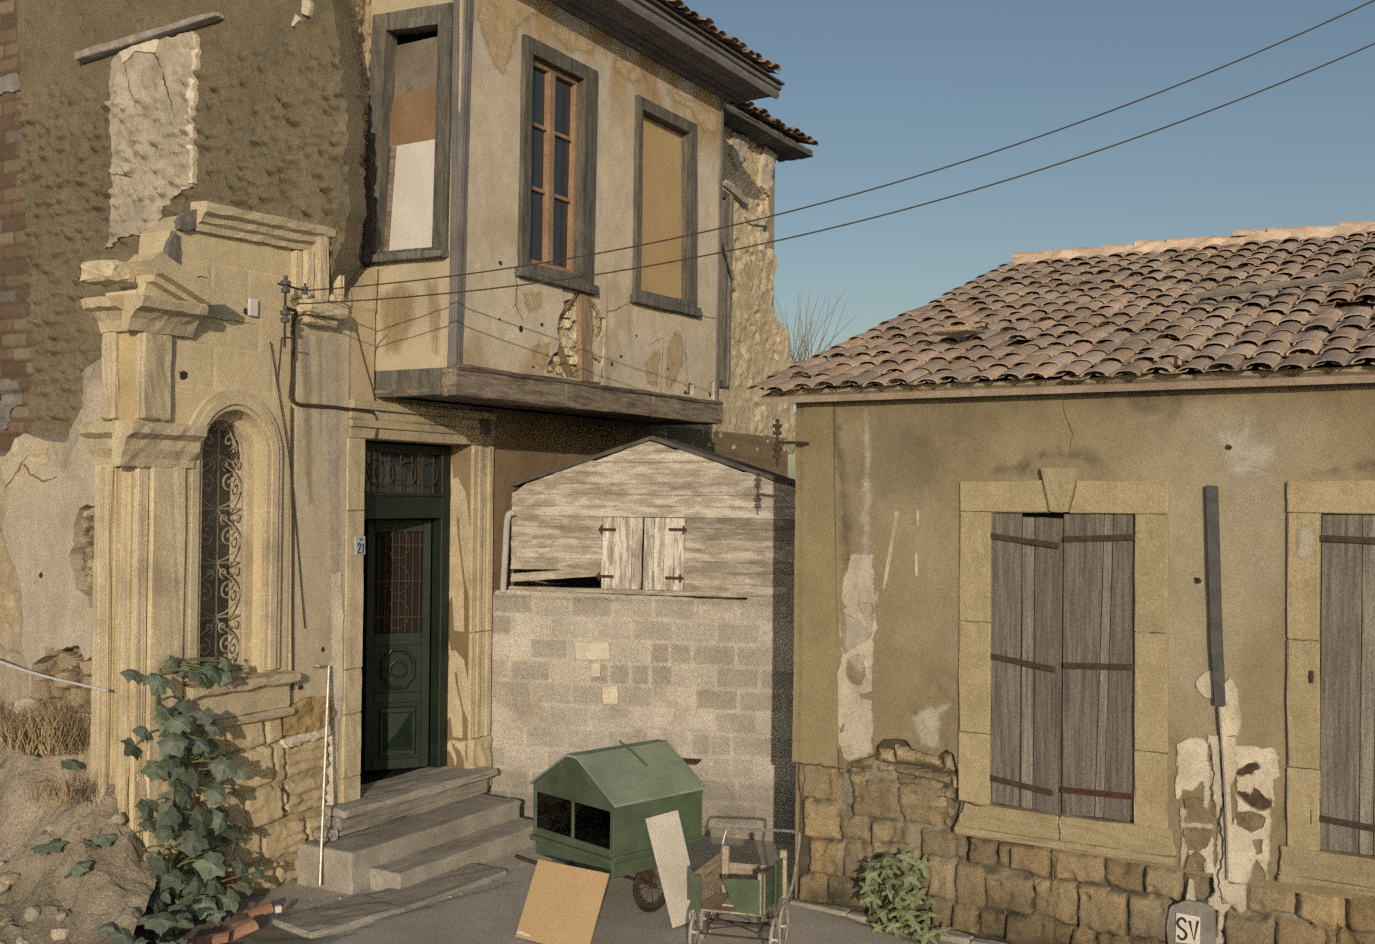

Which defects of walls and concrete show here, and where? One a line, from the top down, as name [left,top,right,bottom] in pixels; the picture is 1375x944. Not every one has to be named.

peeling [104,31,202,263]
spalling [524,288,623,384]
peeling [743,215,769,256]
peeling [838,552,959,806]
peeling [1175,670,1279,944]